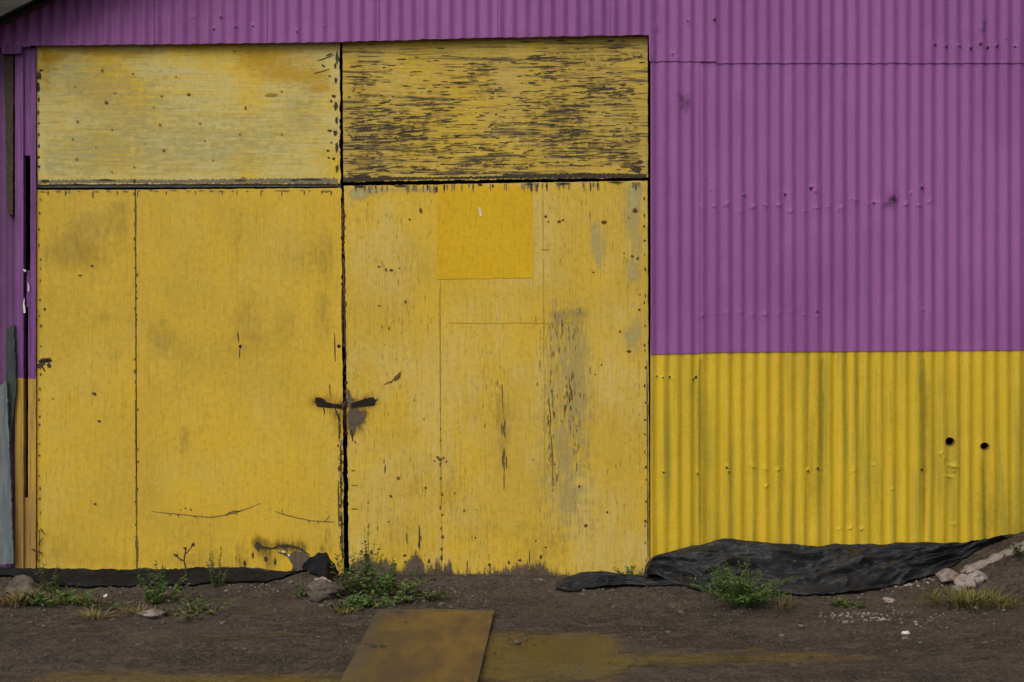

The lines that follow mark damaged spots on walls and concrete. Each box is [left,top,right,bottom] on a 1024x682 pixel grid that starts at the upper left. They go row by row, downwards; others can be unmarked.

peeling [36,40,646,394]
peeling [537,312,584,492]